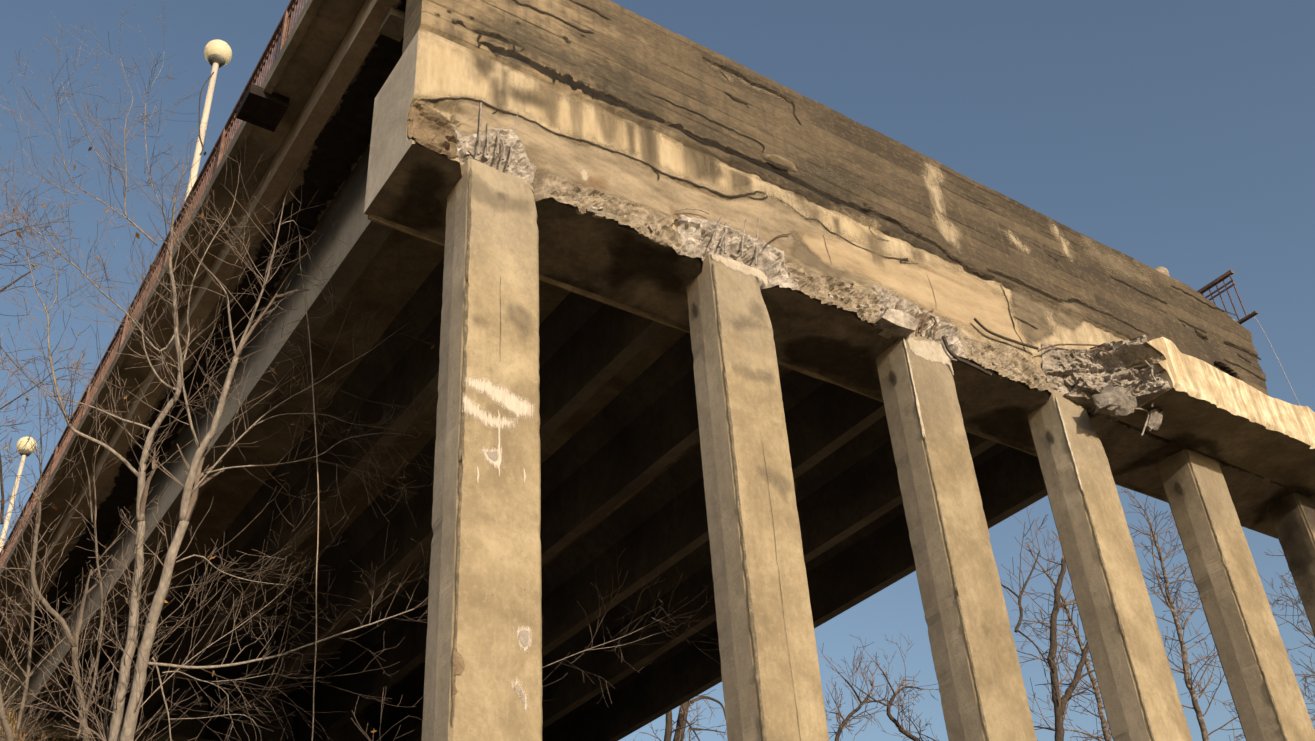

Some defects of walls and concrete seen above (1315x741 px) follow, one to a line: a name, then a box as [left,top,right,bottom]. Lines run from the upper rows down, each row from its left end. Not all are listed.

crack [514,0,612,33]
water stain [476,15,662,162]
water stain [707,62,785,101]
water stain [683,147,750,192]
water stain [766,160,880,220]
crack [412,20,1267,381]
efflorescence [926,164,958,244]
water stain [791,232,845,278]
water stain [868,233,882,263]
water stain [1054,227,1153,287]
water stain [1011,285,1087,345]
peeling [408,96,1170,741]